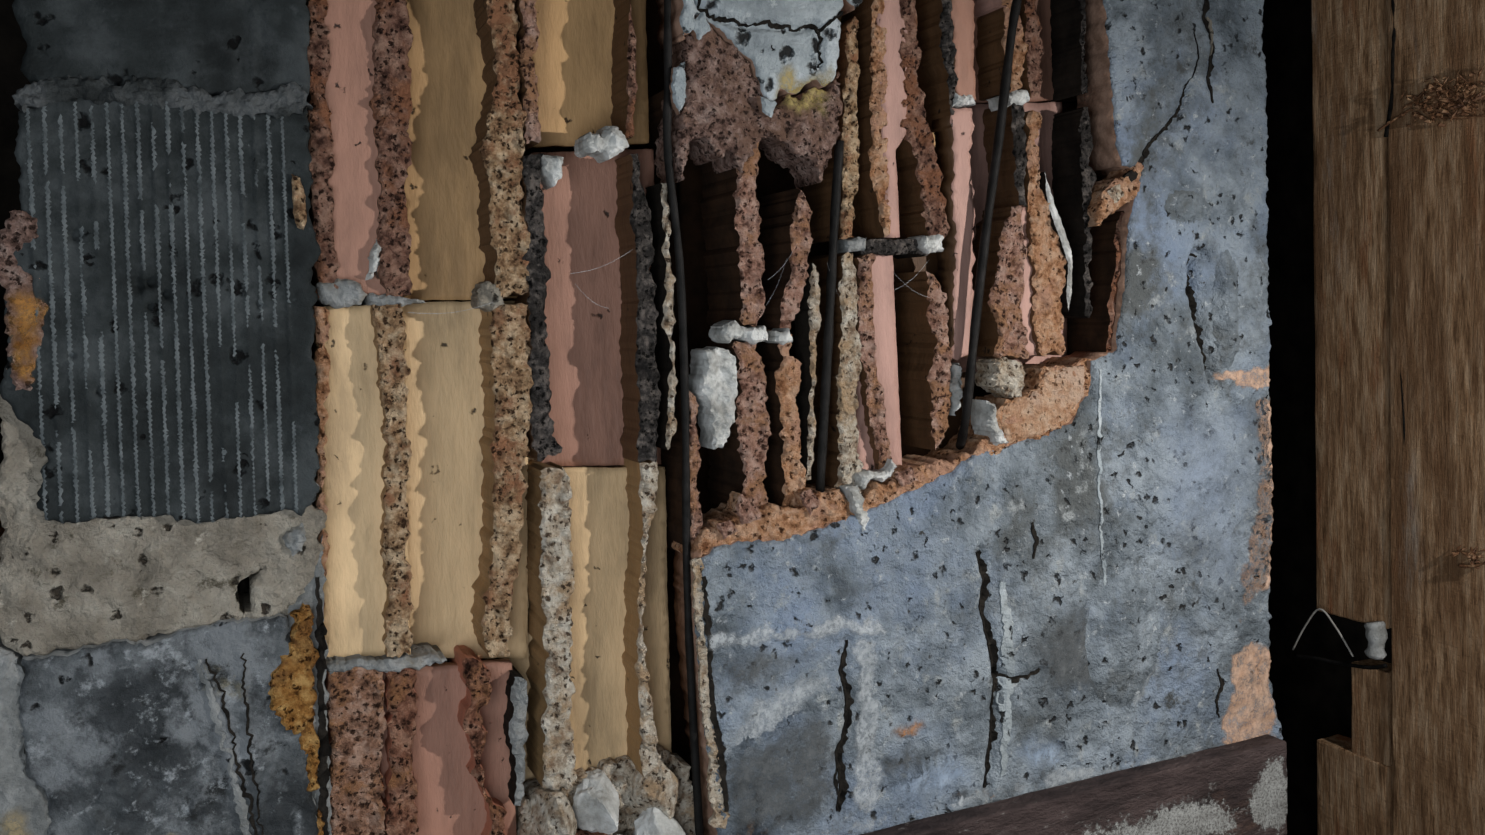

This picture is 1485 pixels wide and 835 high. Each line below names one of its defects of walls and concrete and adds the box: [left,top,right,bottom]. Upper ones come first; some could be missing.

spalling [654,12,843,188]
crack [697,0,844,68]
crack [1122,0,1215,182]
spalling [671,162,1144,559]
peeling [1185,253,1274,602]
corrosion [268,603,320,792]
crack [833,639,854,812]
crack [975,550,1040,788]
peeling [1222,642,1276,744]
corrosion [317,809,325,835]